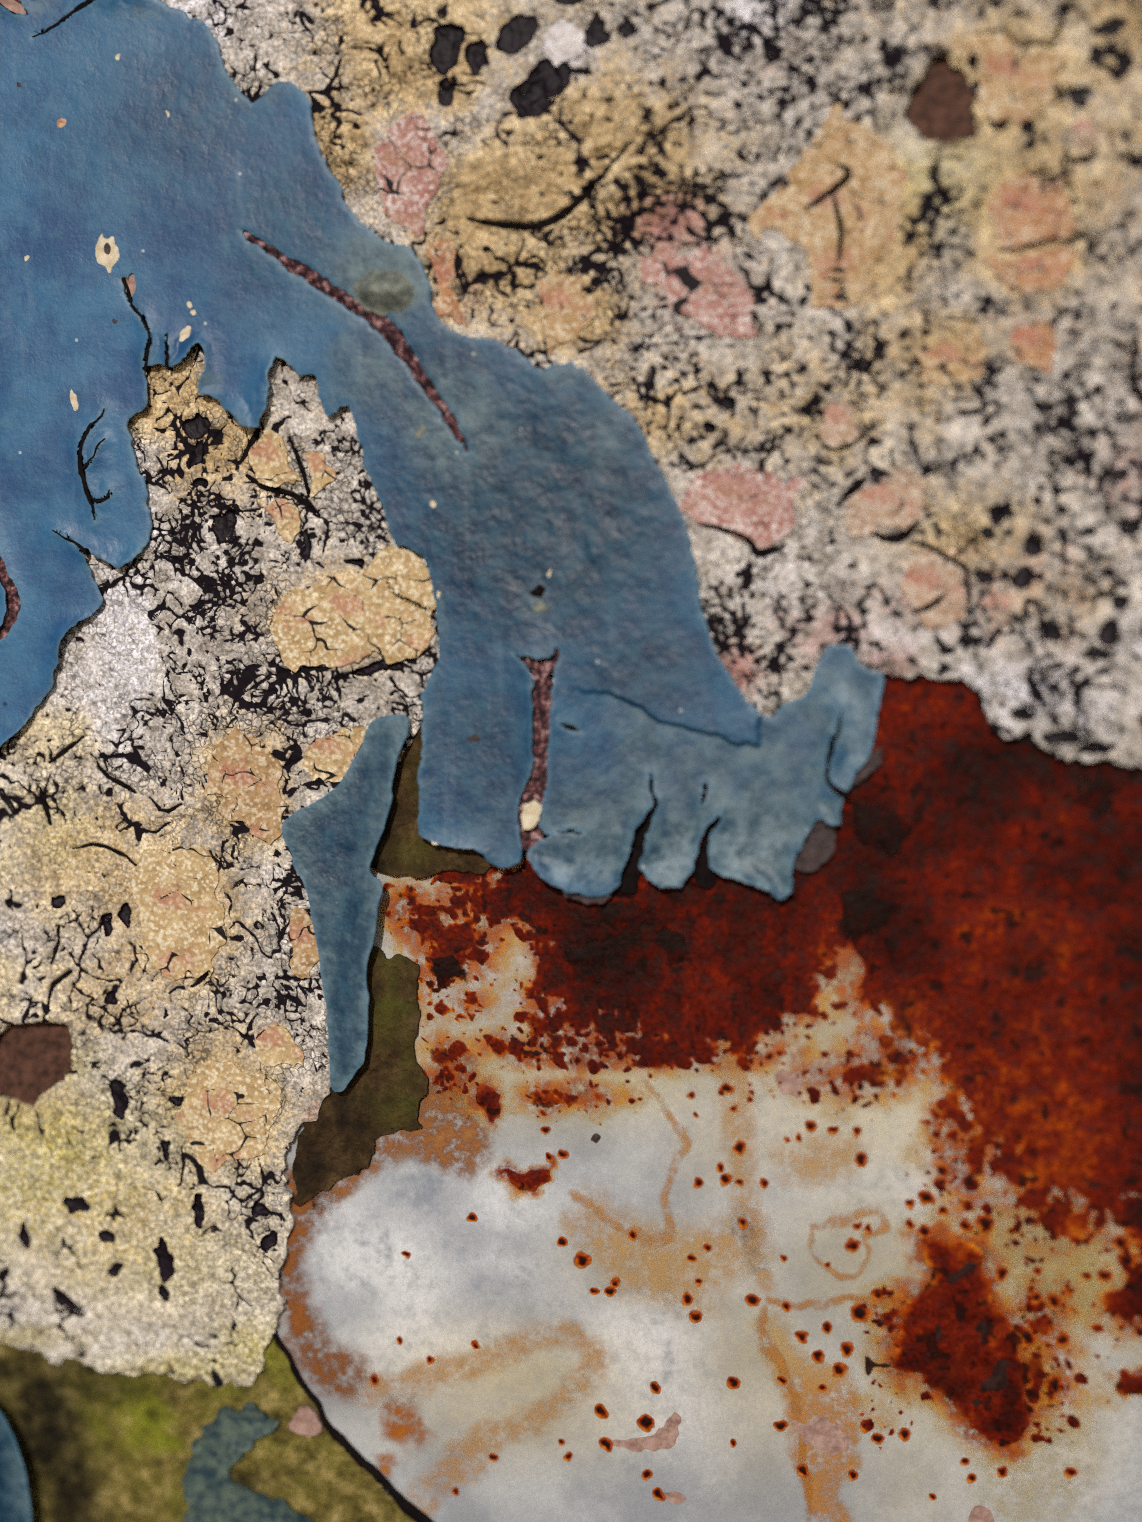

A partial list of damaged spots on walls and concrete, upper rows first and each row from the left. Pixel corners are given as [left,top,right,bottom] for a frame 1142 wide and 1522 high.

crack [466,140,633,231]
crack [243,231,468,452]
peeling [161,0,1142,767]
crack [52,408,112,555]
crack [238,428,321,517]
crack [699,524,785,558]
crack [871,520,972,624]
crack [39,736,182,867]
peeling [0,0,885,1388]
crack [516,648,582,851]
crack [47,925,73,1008]
corrosion [281,673,1142,1484]